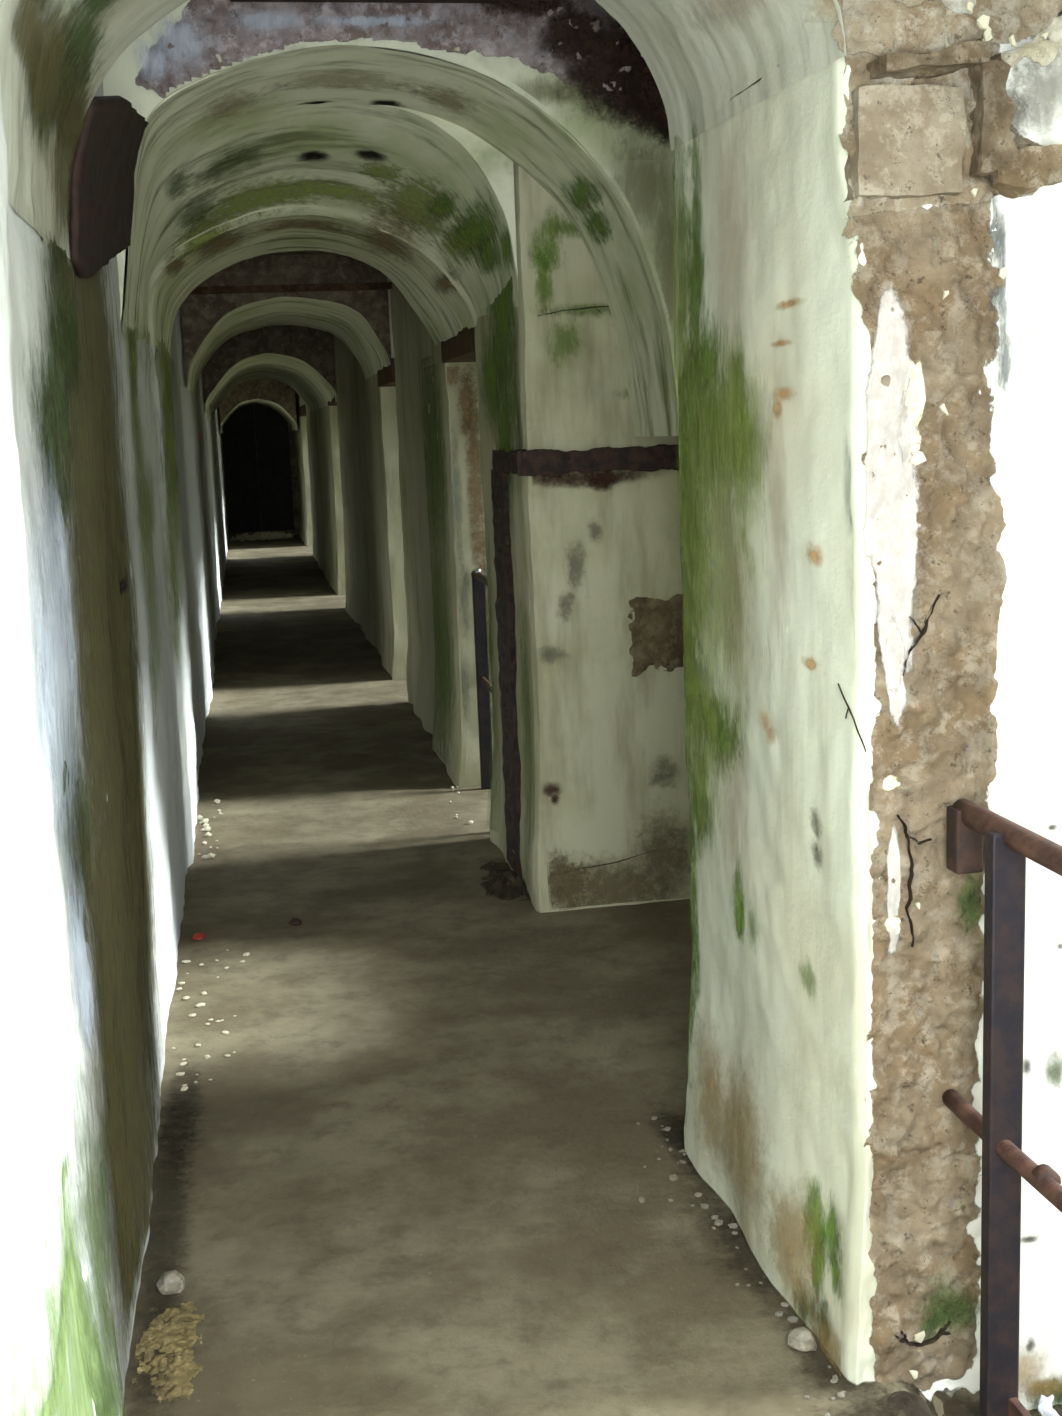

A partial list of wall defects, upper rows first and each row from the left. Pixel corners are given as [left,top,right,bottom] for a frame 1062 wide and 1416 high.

spalling [135,0,619,98]
spalling [603,55,643,91]
spalling [628,594,684,677]
leakage [13,0,197,1411]
crack [838,683,867,752]
spalling [832,0,1062,1391]
leakage [547,820,692,908]